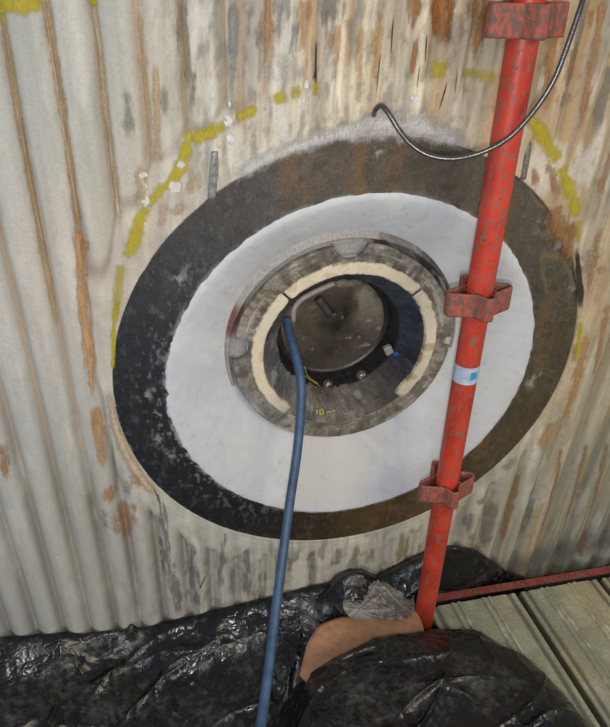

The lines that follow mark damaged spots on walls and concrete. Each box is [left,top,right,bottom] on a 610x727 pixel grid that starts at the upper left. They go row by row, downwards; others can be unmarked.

rust [408,0,420,26]
rust [431,0,453,40]
rust [563,336,588,417]
rust [91,408,107,463]
rust [502,475,518,537]
damp [158,496,181,610]